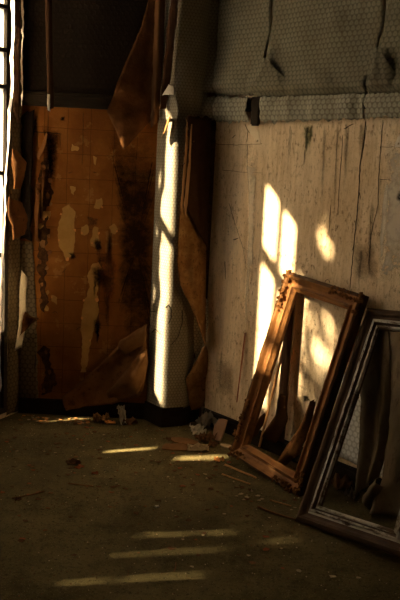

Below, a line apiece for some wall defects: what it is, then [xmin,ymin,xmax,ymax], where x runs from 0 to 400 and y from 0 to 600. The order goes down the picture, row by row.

peeling [58,205,100,261]
peeling [80,262,102,372]
leakage [117,155,152,333]
spalling [206,120,216,299]
crack [329,120,400,290]